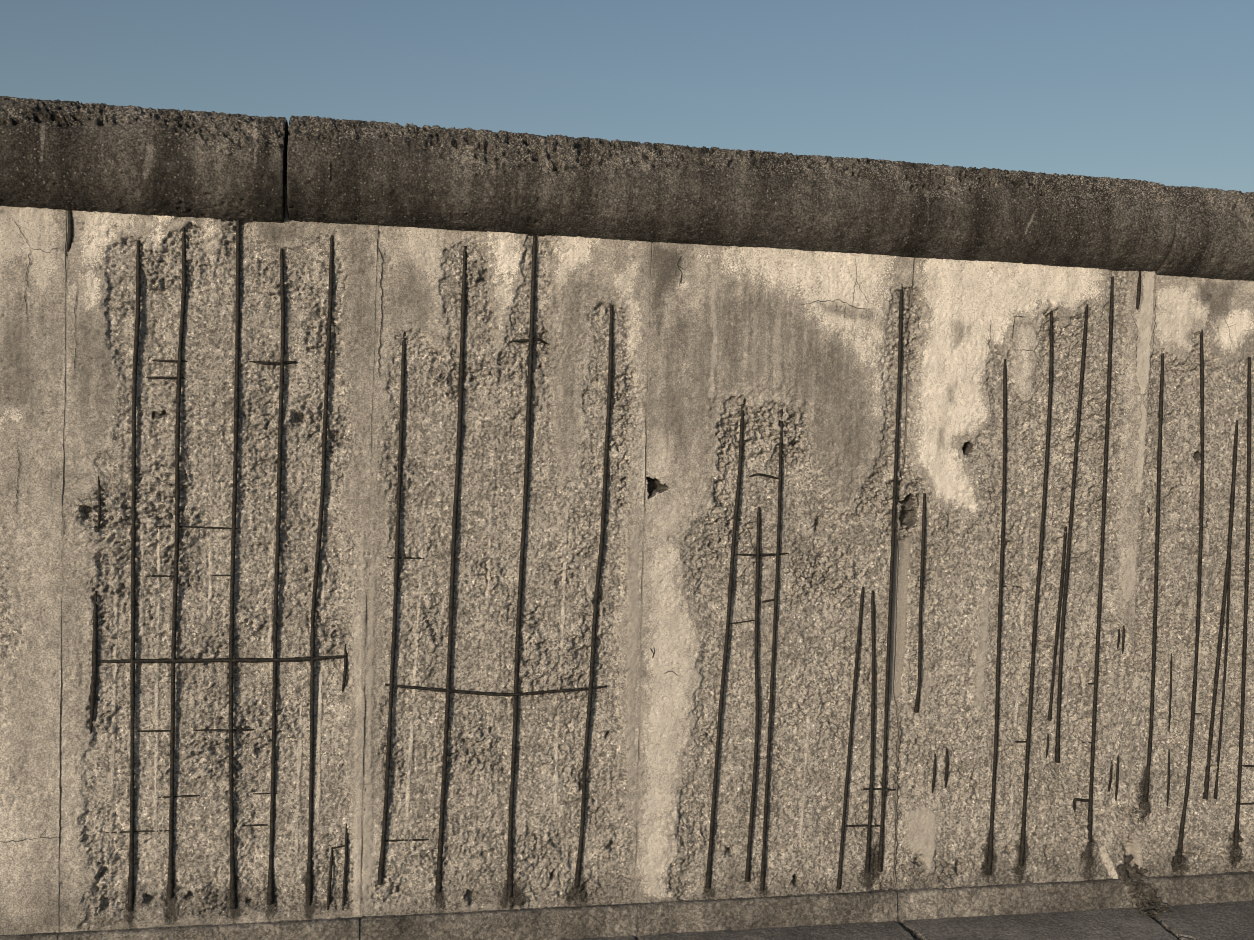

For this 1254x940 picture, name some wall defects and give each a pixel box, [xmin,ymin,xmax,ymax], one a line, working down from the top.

spalling [0,206,359,931]
damp [652,247,679,310]
damp [692,287,863,482]
spalling [371,227,1254,918]